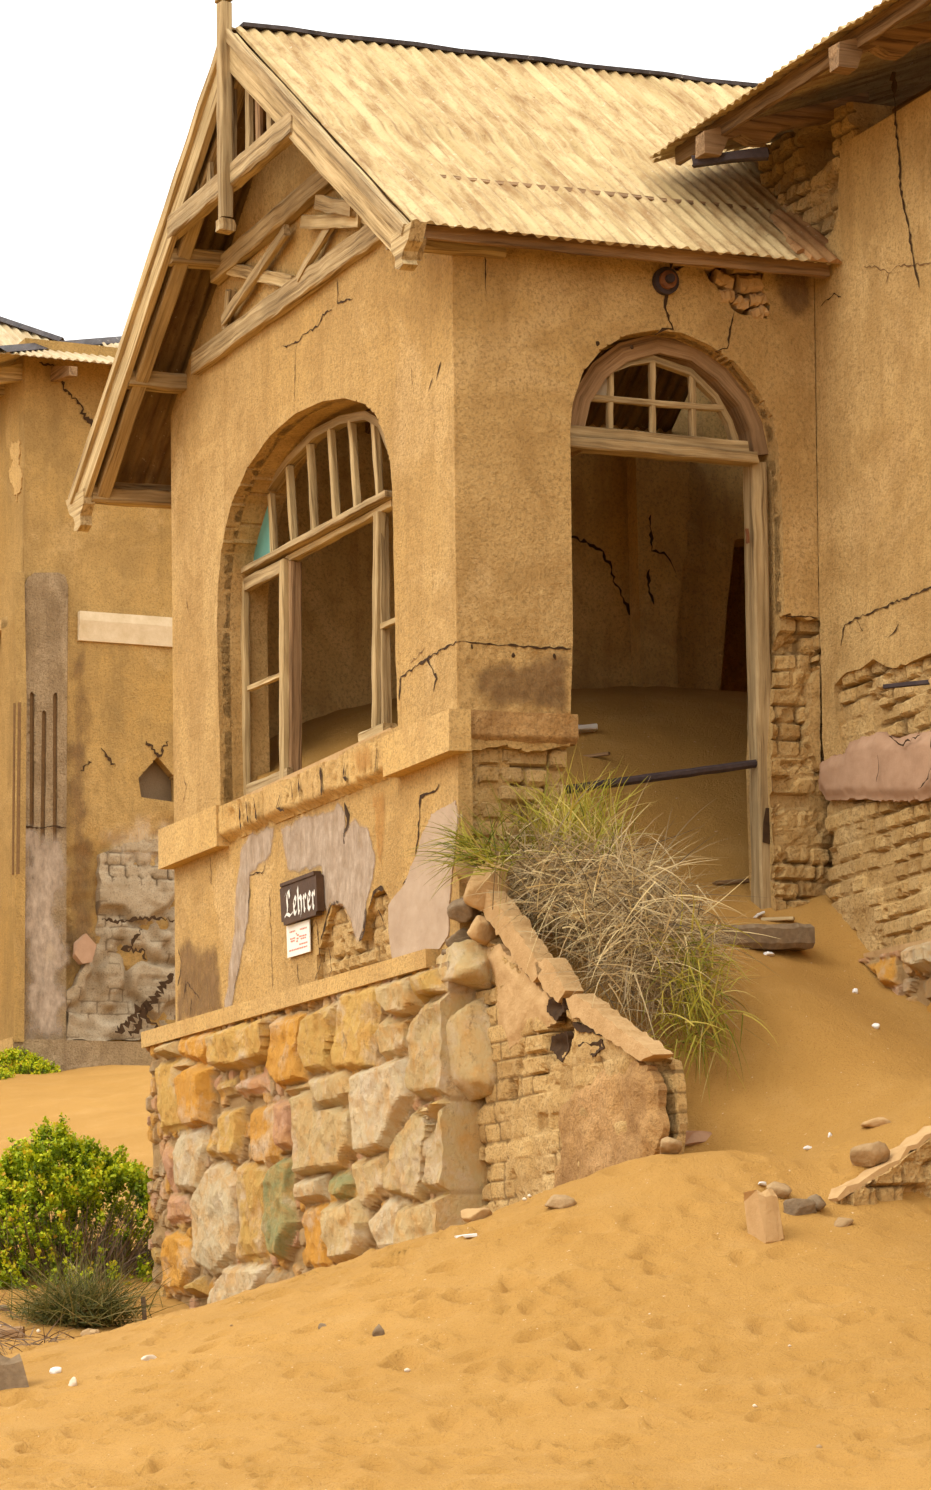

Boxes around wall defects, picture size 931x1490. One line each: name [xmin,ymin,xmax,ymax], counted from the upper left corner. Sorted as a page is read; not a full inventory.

crack [864,72,930,287]
crack [284,283,352,390]
crack [655,263,674,335]
crack [715,314,734,352]
crack [39,362,93,426]
crack [572,515,676,615]
crack [783,586,931,642]
crack [398,641,571,696]
spalling [66,839,176,1041]